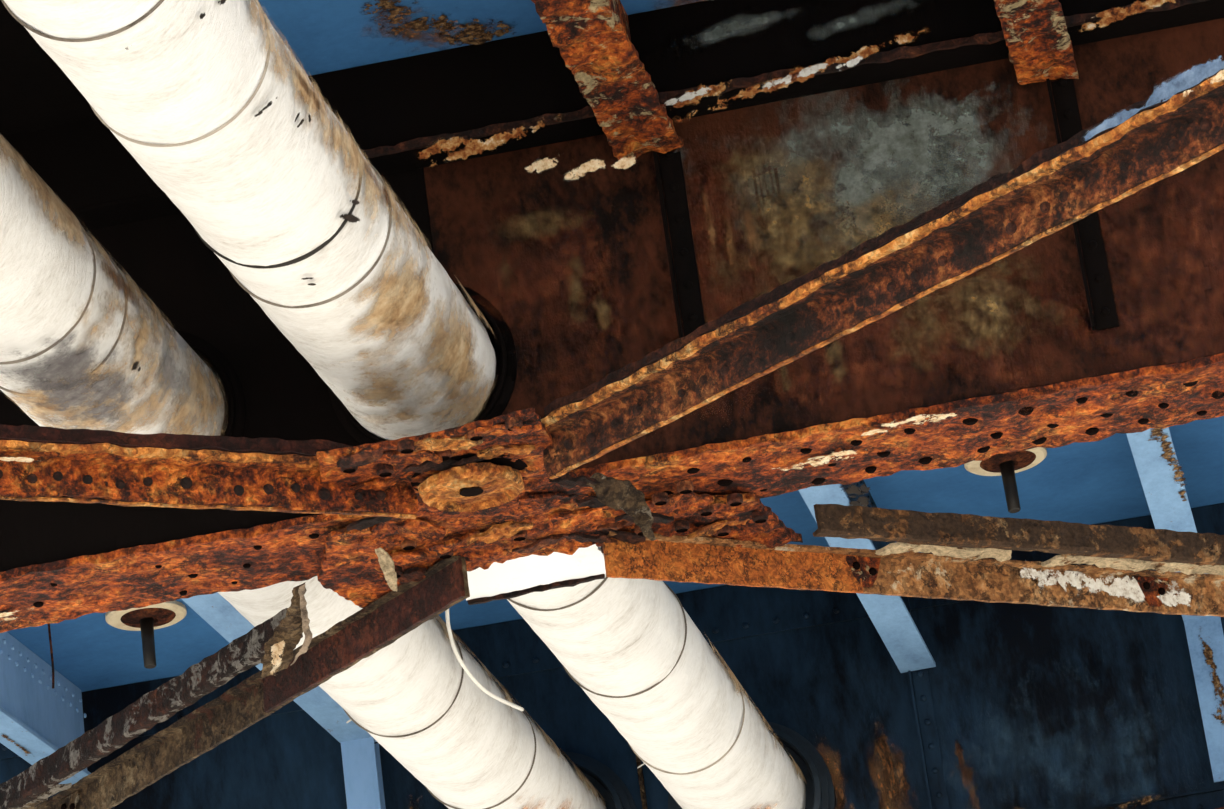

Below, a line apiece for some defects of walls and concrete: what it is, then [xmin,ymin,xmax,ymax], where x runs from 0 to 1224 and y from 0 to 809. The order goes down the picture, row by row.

corrosion [665,30,928,123]
corrosion [417,117,545,167]
corrosion [525,157,636,180]
corrosion [782,273,1064,399]
corrosion [980,450,1036,473]
corrosion [120,608,176,628]
peeling [270,640,285,674]
corrosion [819,747,846,809]
corrosion [870,724,911,809]